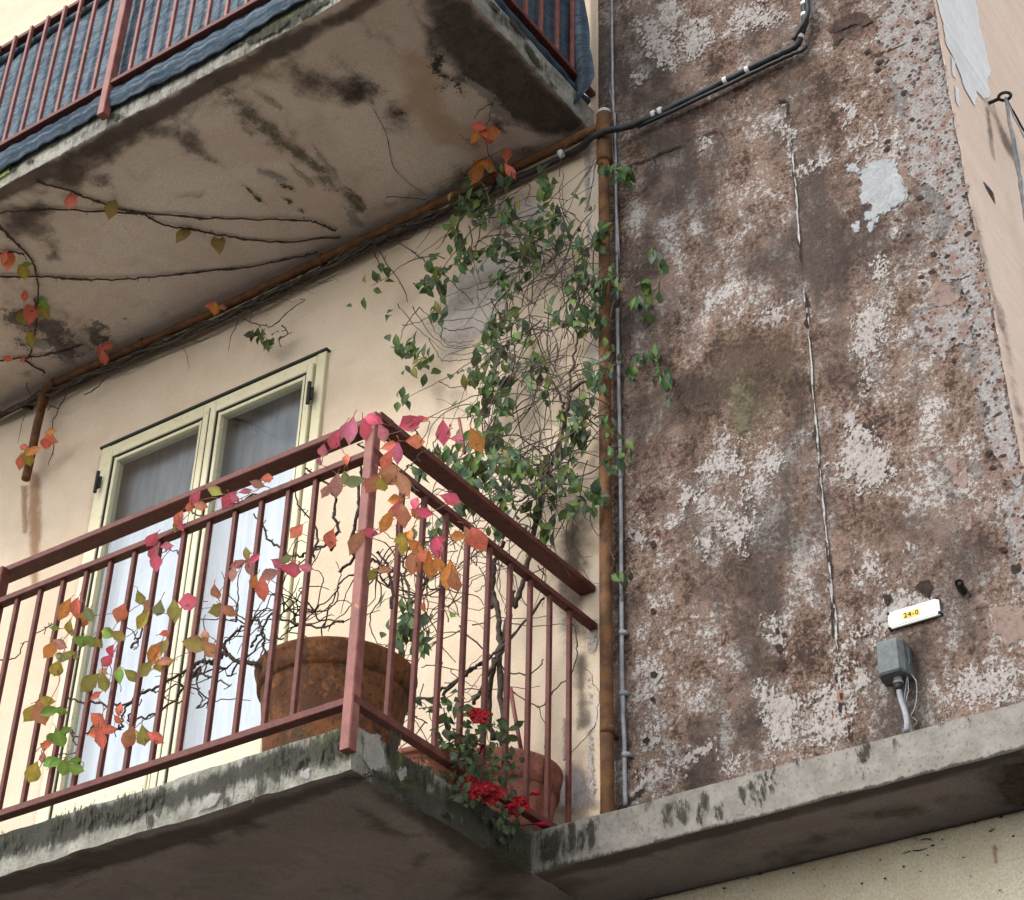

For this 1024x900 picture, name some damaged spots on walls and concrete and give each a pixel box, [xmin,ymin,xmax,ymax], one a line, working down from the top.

leakage [296,71,373,104]
leakage [428,0,576,130]
peeling [696,135,715,158]
leakage [257,163,315,214]
leakage [343,192,364,227]
flaking render [770,0,1024,714]
crack [628,99,852,743]
leakage [0,783,166,857]
leakage [248,728,340,804]
leakage [661,790,723,828]
leakage [737,761,777,806]
leakage [855,739,870,777]